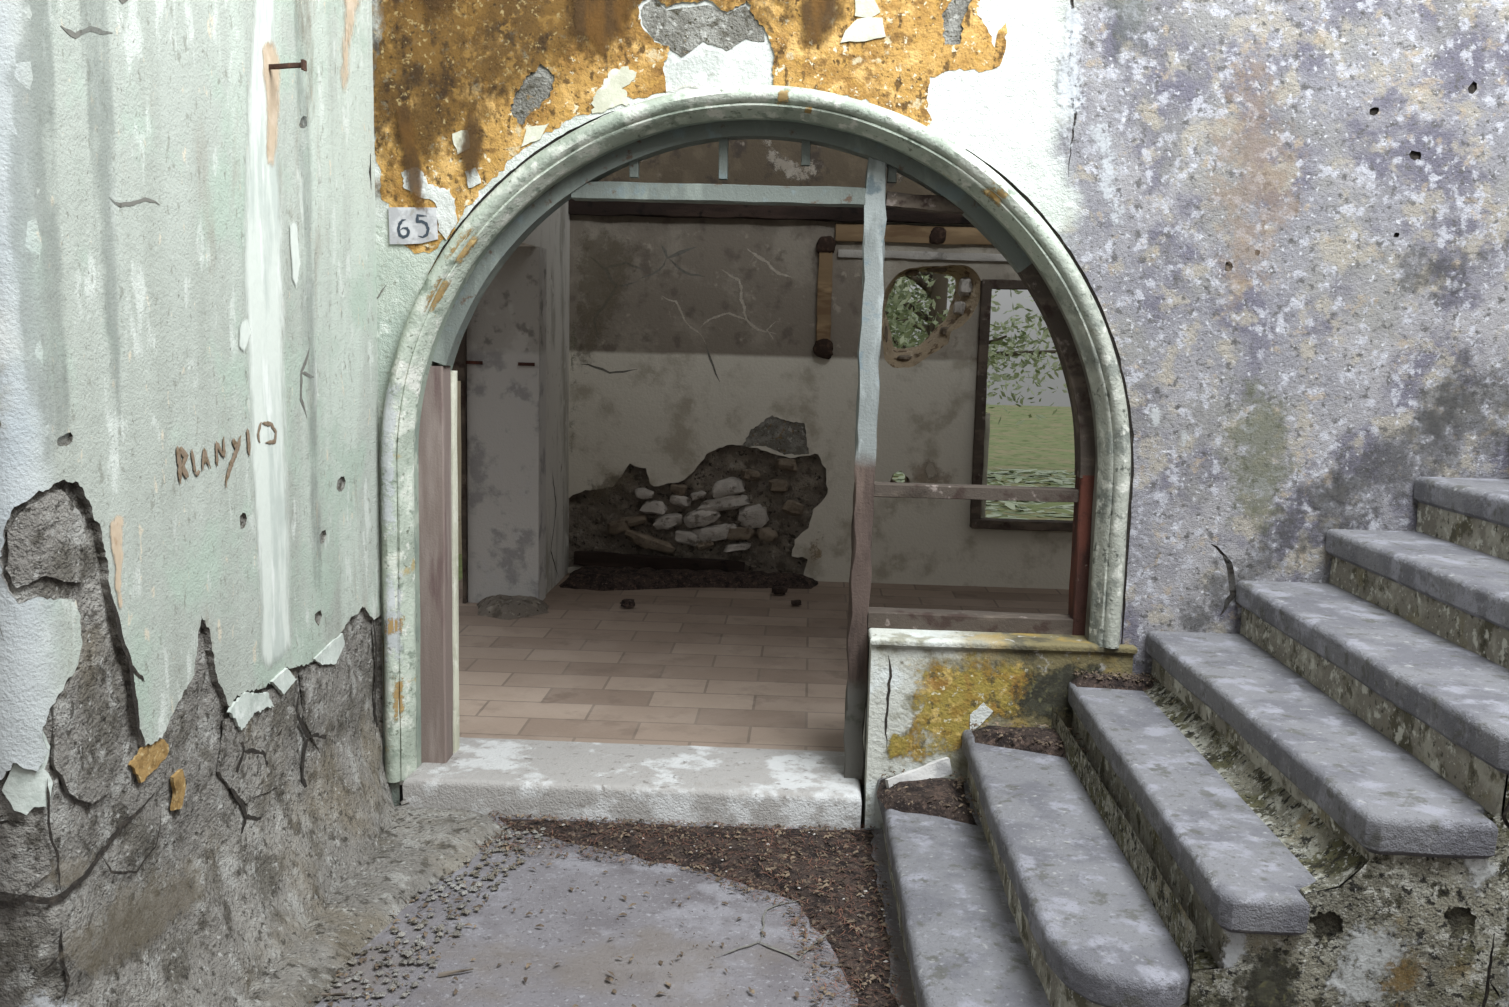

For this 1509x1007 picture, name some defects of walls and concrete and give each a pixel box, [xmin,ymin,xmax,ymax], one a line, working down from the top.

damp [372,0,702,209]
peeling [374,0,1008,311]
damp [745,0,846,43]
crack [1068,0,1080,177]
crack [640,245,792,382]
spalling [884,326,912,361]
spalling [0,0,405,1007]
spalling [569,415,828,575]
crack [1211,544,1236,616]
crack [231,678,331,834]
crack [0,778,162,1003]
crack [1482,933,1501,1007]